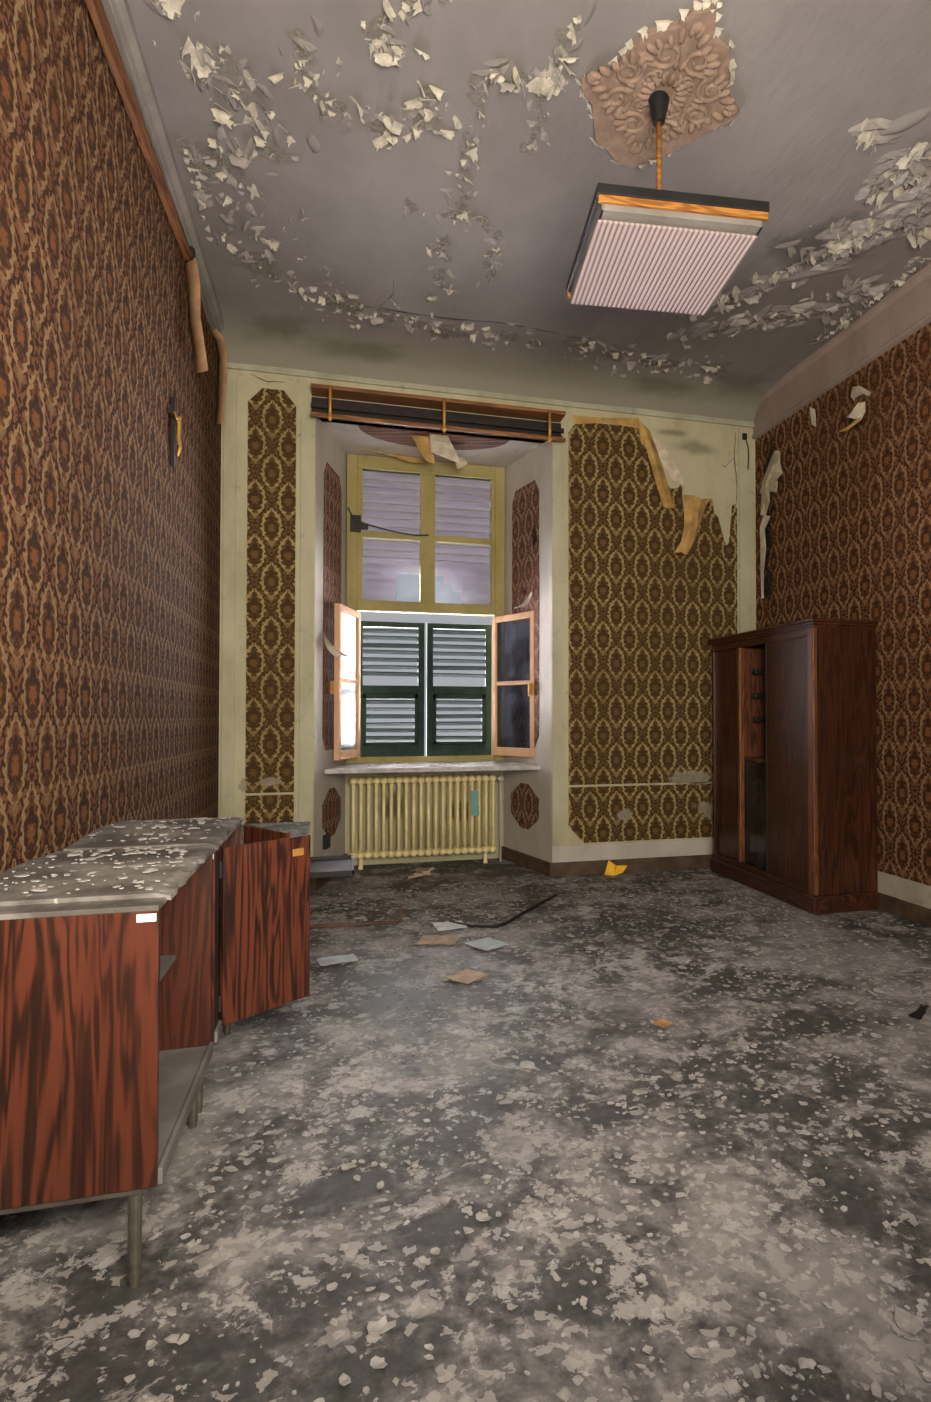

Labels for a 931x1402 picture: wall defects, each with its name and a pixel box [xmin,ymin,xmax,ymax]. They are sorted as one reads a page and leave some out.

peeling [608,0,737,87]
peeling [143,0,594,356]
peeling [563,118,931,384]